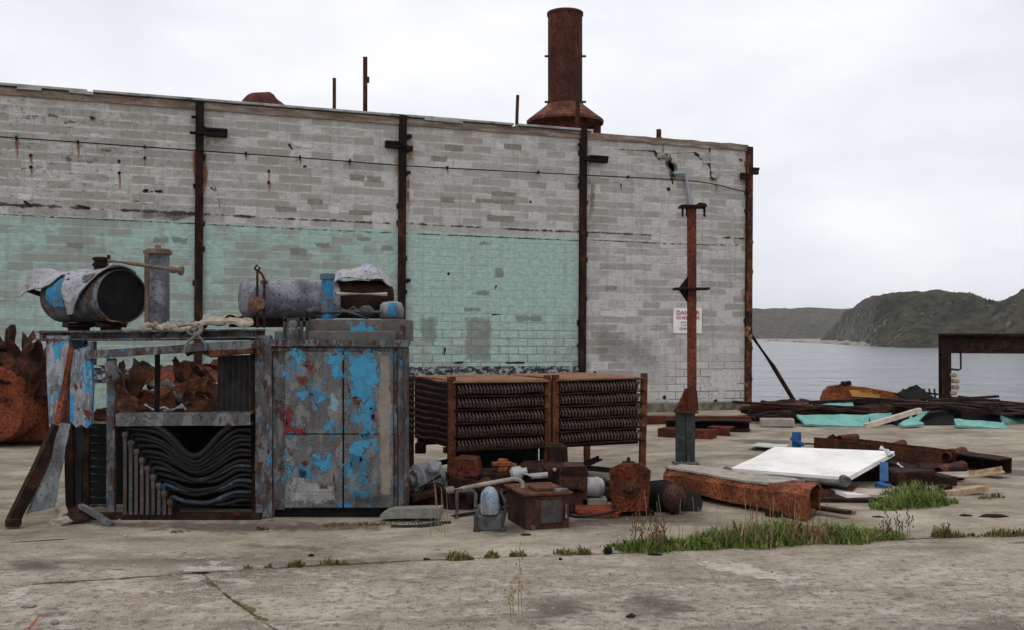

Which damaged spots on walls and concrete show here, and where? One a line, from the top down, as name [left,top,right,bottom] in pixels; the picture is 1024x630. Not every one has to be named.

crack [619,146,713,178]